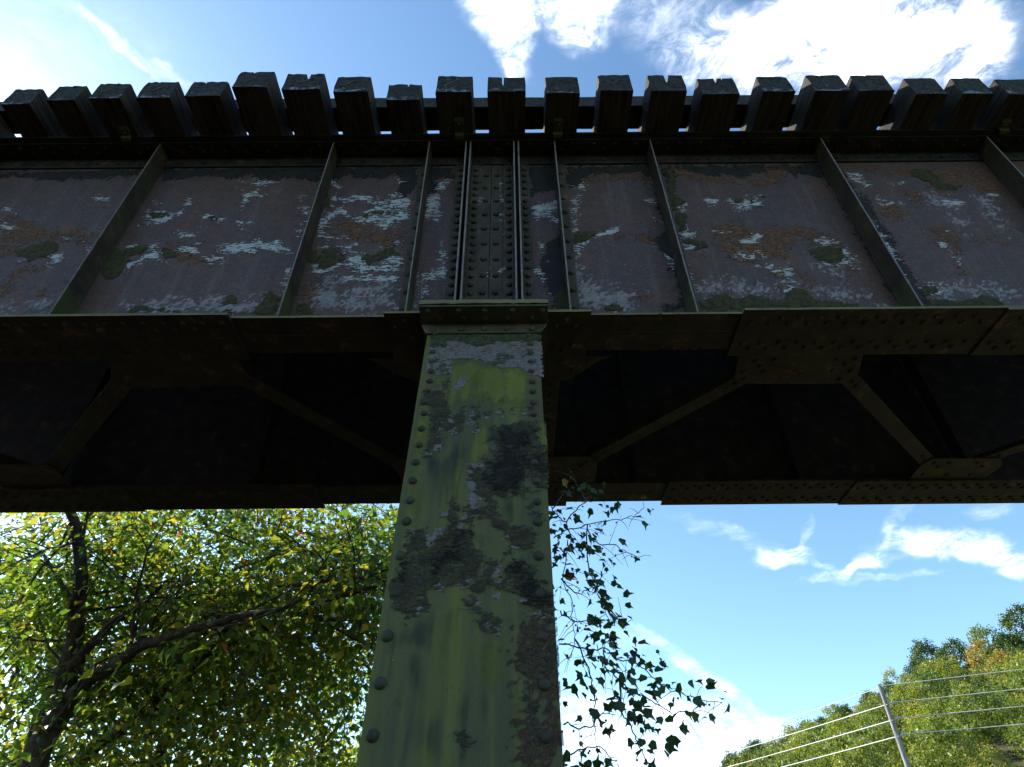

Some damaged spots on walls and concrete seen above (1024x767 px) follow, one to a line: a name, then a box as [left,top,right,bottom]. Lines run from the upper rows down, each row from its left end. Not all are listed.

peeling [124,243,170,271]
peeling [137,180,292,264]
peeling [296,179,412,283]
peeling [531,182,619,275]
peeling [677,194,762,212]
peeling [712,230,798,293]
corrosion [707,220,843,294]
peeling [815,236,860,270]
peeling [847,173,913,210]
peeling [419,340,544,459]
peeling [389,444,557,637]